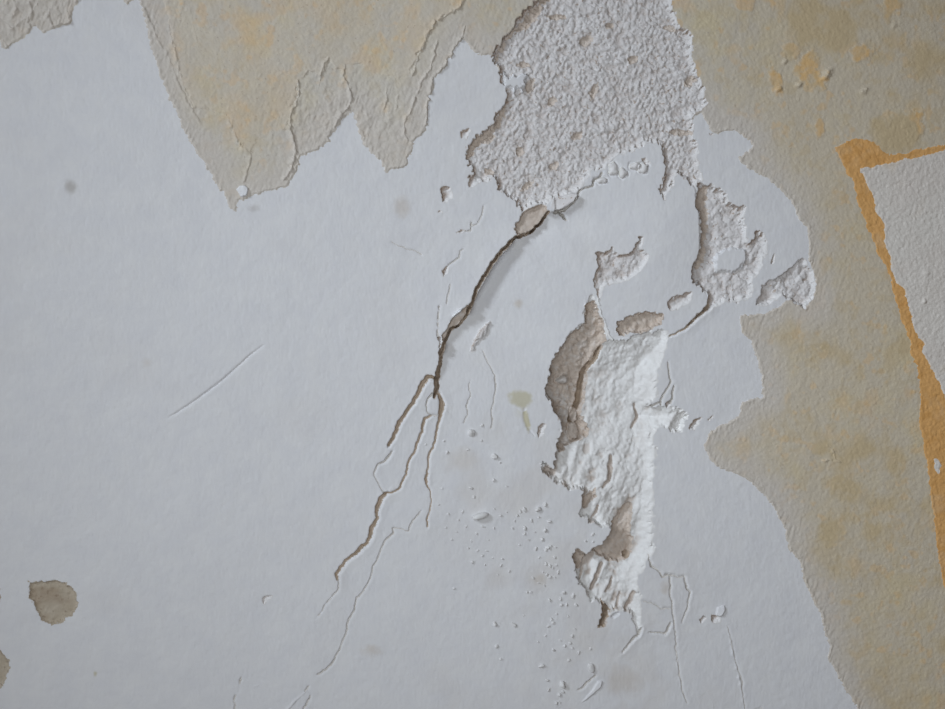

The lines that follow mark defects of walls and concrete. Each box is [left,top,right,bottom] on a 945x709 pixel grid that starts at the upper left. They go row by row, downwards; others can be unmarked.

crack [303,172,603,709]
flaking render [461,0,817,632]